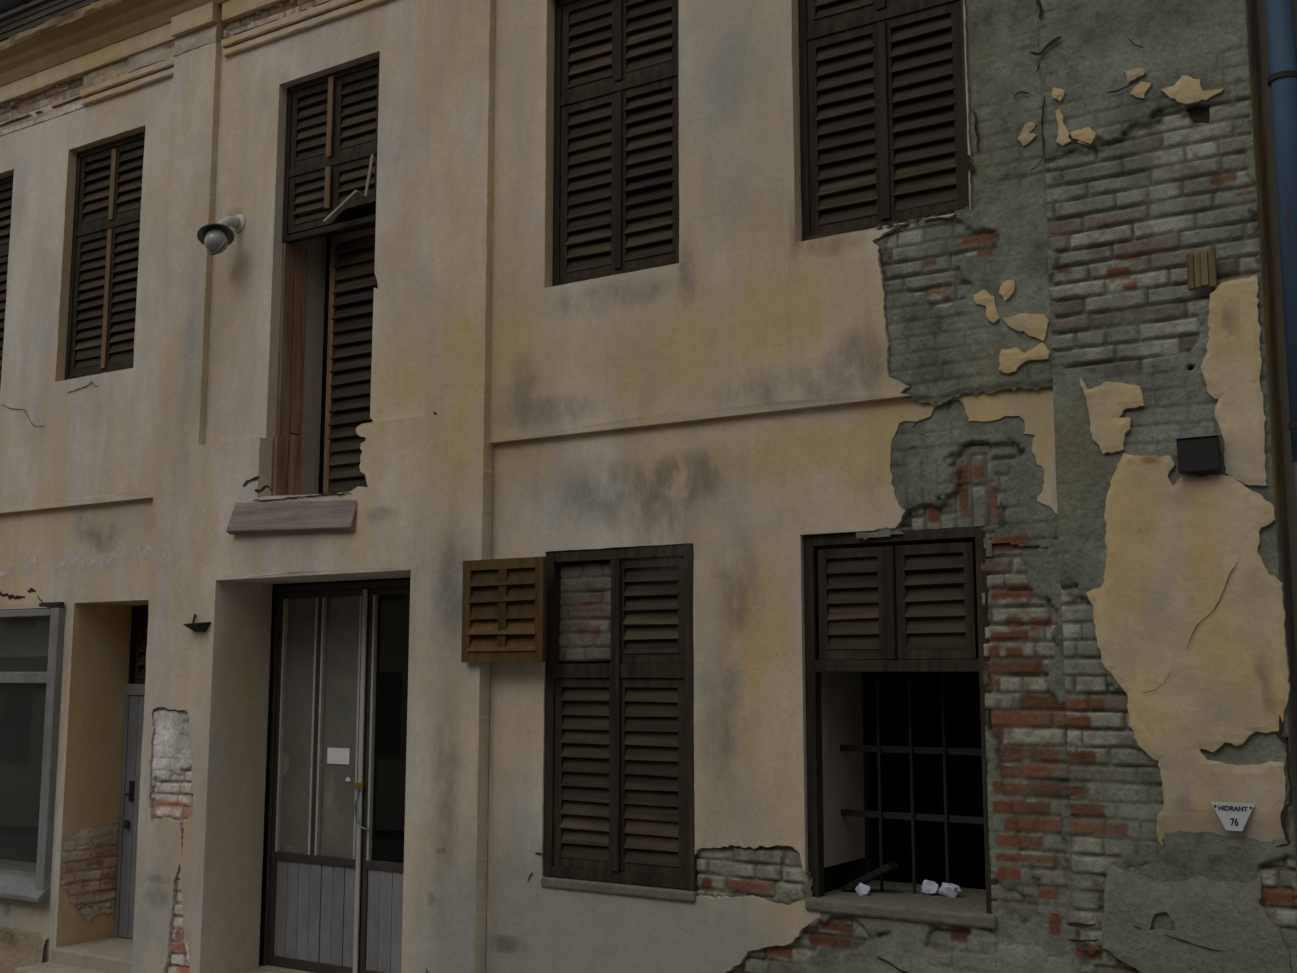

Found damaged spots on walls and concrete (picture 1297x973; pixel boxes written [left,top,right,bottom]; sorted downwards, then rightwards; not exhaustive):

spalling [697,0,1297,973]
crack [0,587,44,603]
crack [1143,559,1240,693]
spalling [151,709,193,830]
spalling [61,820,119,921]
spalling [167,870,190,973]